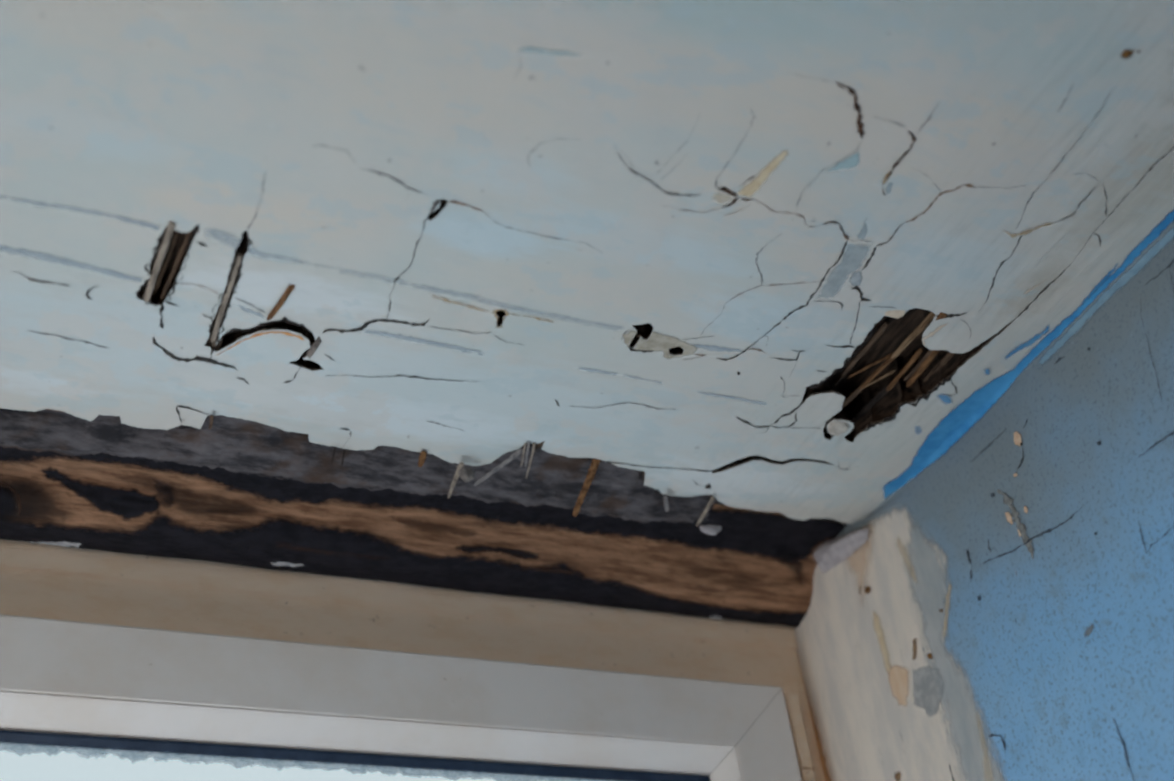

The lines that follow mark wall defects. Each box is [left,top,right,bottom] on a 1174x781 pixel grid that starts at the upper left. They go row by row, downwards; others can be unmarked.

hole [136,221,207,329]
crack [176,406,209,430]
spalling [204,172,266,361]
crack [152,145,489,384]
spalling [0,408,728,535]
leakage [0,446,847,627]
peeling [622,323,696,359]
crack [608,83,1174,474]
hole [801,308,1017,442]
spalling [991,490,1034,559]
crack [1138,521,1174,554]
peeling [873,613,943,715]